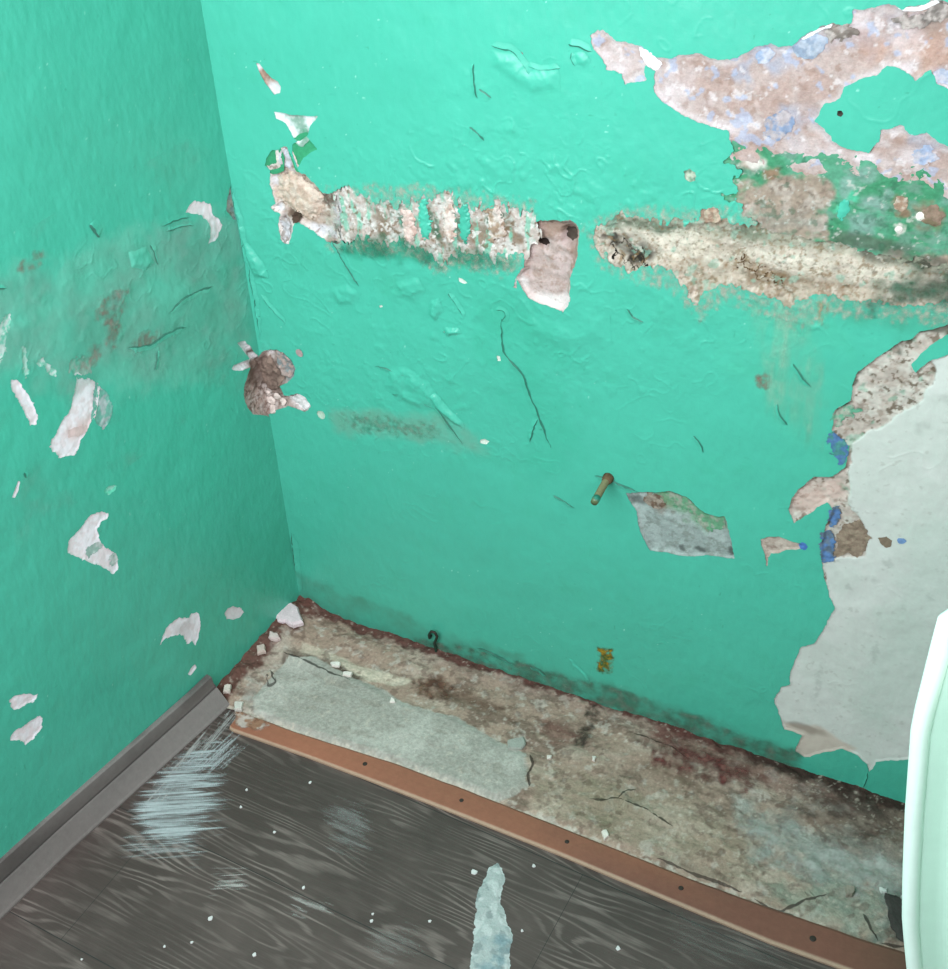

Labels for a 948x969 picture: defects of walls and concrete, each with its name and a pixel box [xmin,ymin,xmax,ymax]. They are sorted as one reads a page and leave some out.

peeling [256,63,281,94]
peeling [265,0,948,320]
peeling [0,314,12,364]
peeling [11,346,113,458]
peeling [67,511,118,574]
peeling [160,612,201,645]
spalling [217,324,948,945]
rust [597,648,614,672]
peeling [9,694,38,710]
peeling [10,716,43,745]
damp [575,688,634,746]
damp [806,849,894,894]